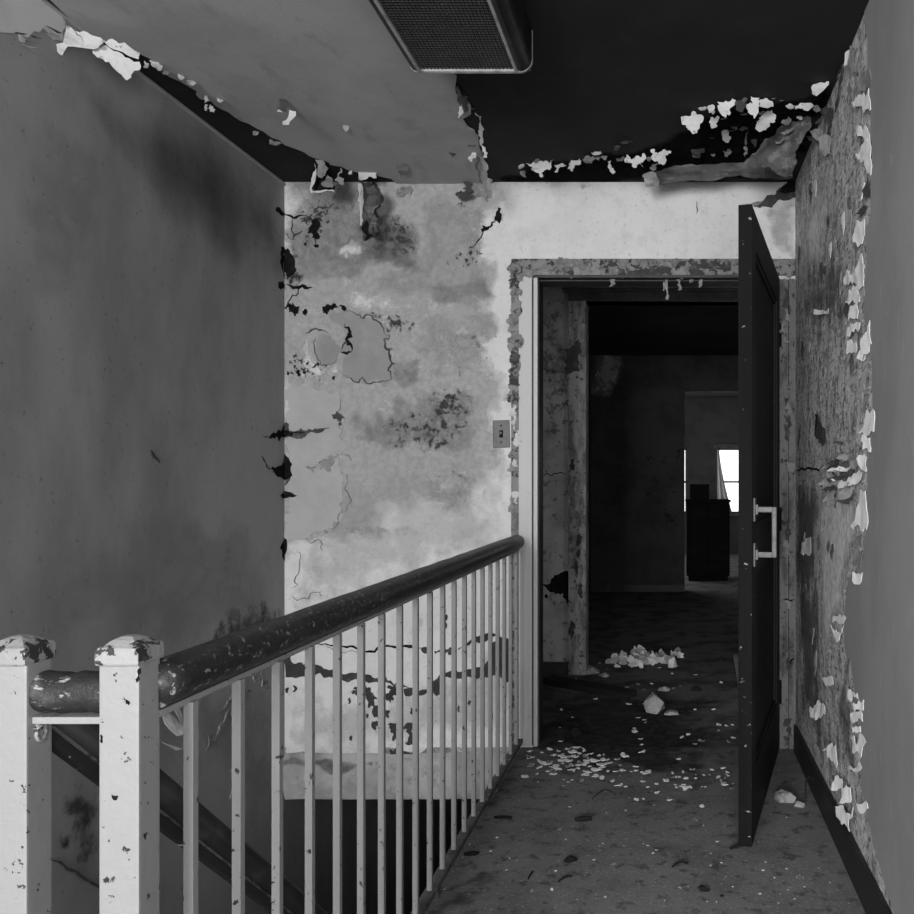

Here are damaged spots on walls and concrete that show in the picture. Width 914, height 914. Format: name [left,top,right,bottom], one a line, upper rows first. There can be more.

peeling [0,0,197,86]
peeling [518,141,671,177]
crack [471,207,504,248]
crack [262,422,350,498]
peeling [280,303,395,561]
crack [341,326,353,355]
damp [284,90,830,536]
peeling [506,257,738,535]
peeling [681,0,914,914]
damp [797,488,856,706]
spalling [284,633,509,754]
damp [839,687,854,764]